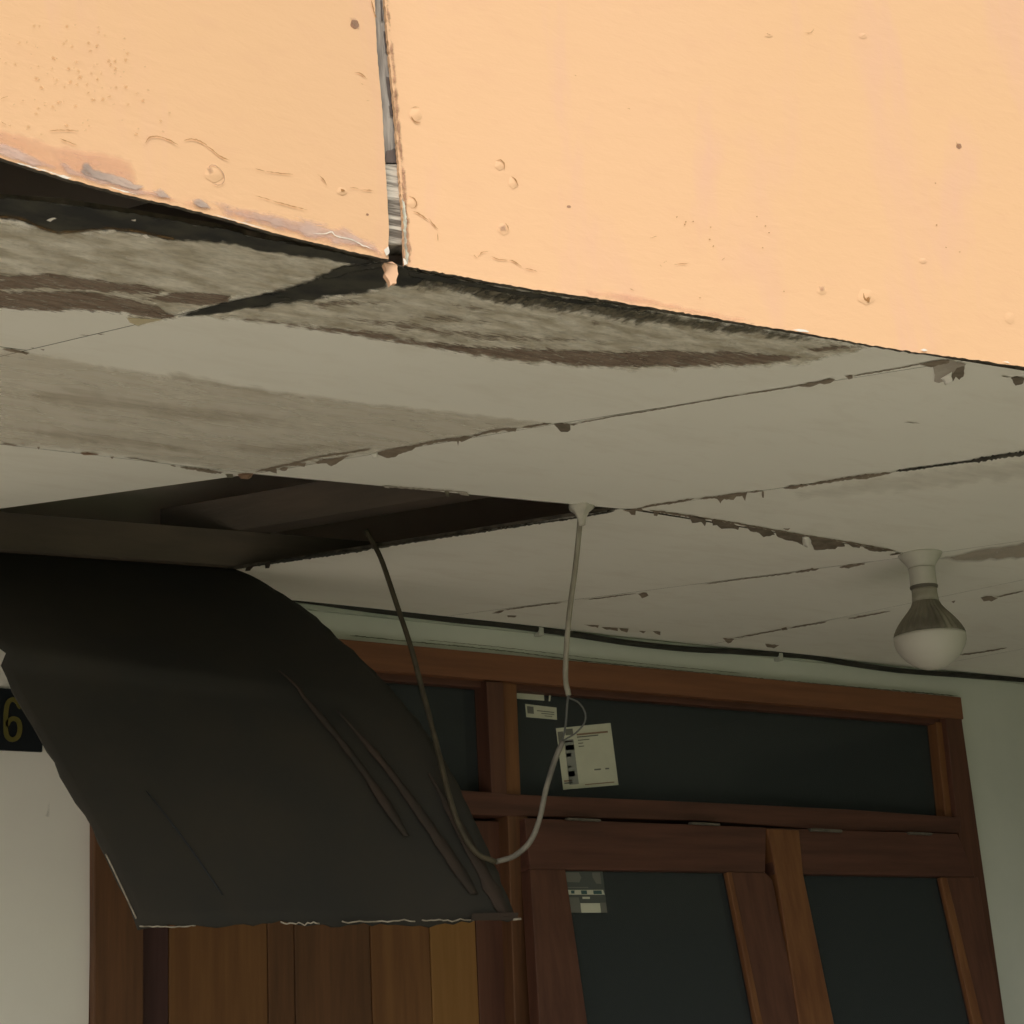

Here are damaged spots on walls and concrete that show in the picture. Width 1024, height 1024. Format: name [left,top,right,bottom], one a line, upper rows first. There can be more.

peeling [194,0,411,265]
flaking render [0,144,170,208]
damp [0,196,858,369]
flaking render [0,349,966,525]
peeling [783,451,1024,489]
flaking render [270,497,572,542]
peeling [623,491,901,555]
peeling [709,568,818,584]
peeling [588,625,660,635]
peeling [723,621,826,648]
spalling [105,854,196,928]